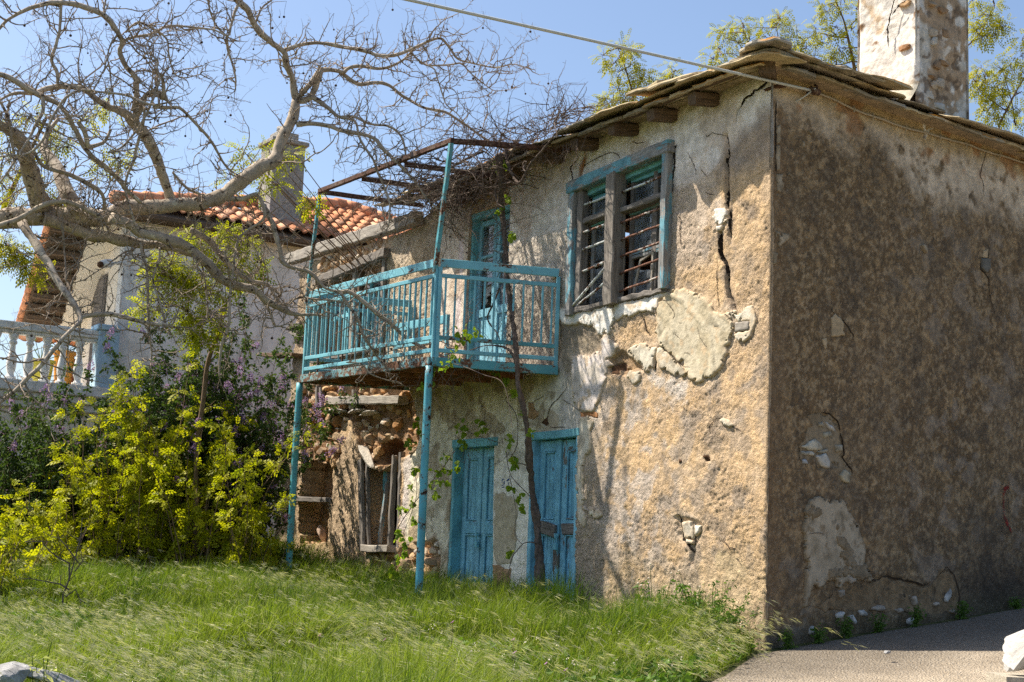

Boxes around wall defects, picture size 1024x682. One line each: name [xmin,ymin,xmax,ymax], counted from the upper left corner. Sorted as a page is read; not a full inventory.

crack [671,82,777,310]
flaking render [551,268,686,527]
spalling [798,412,853,483]
flaking render [680,517,702,554]
spalling [814,524,960,625]